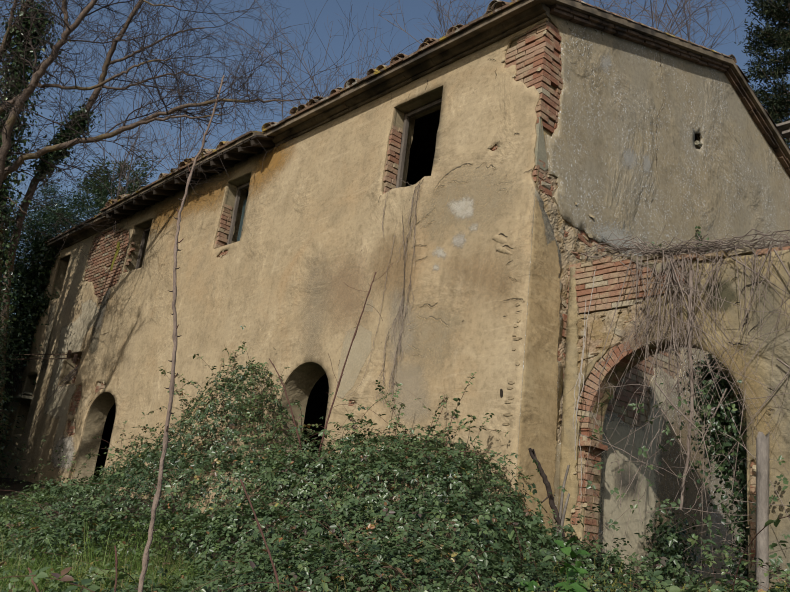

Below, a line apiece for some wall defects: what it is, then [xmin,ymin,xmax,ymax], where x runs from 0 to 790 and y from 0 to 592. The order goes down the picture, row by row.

spalling [501,21,563,134]
crack [410,162,532,262]
spalling [566,246,688,314]
spalling [44,228,136,469]
leakage [617,467,638,494]